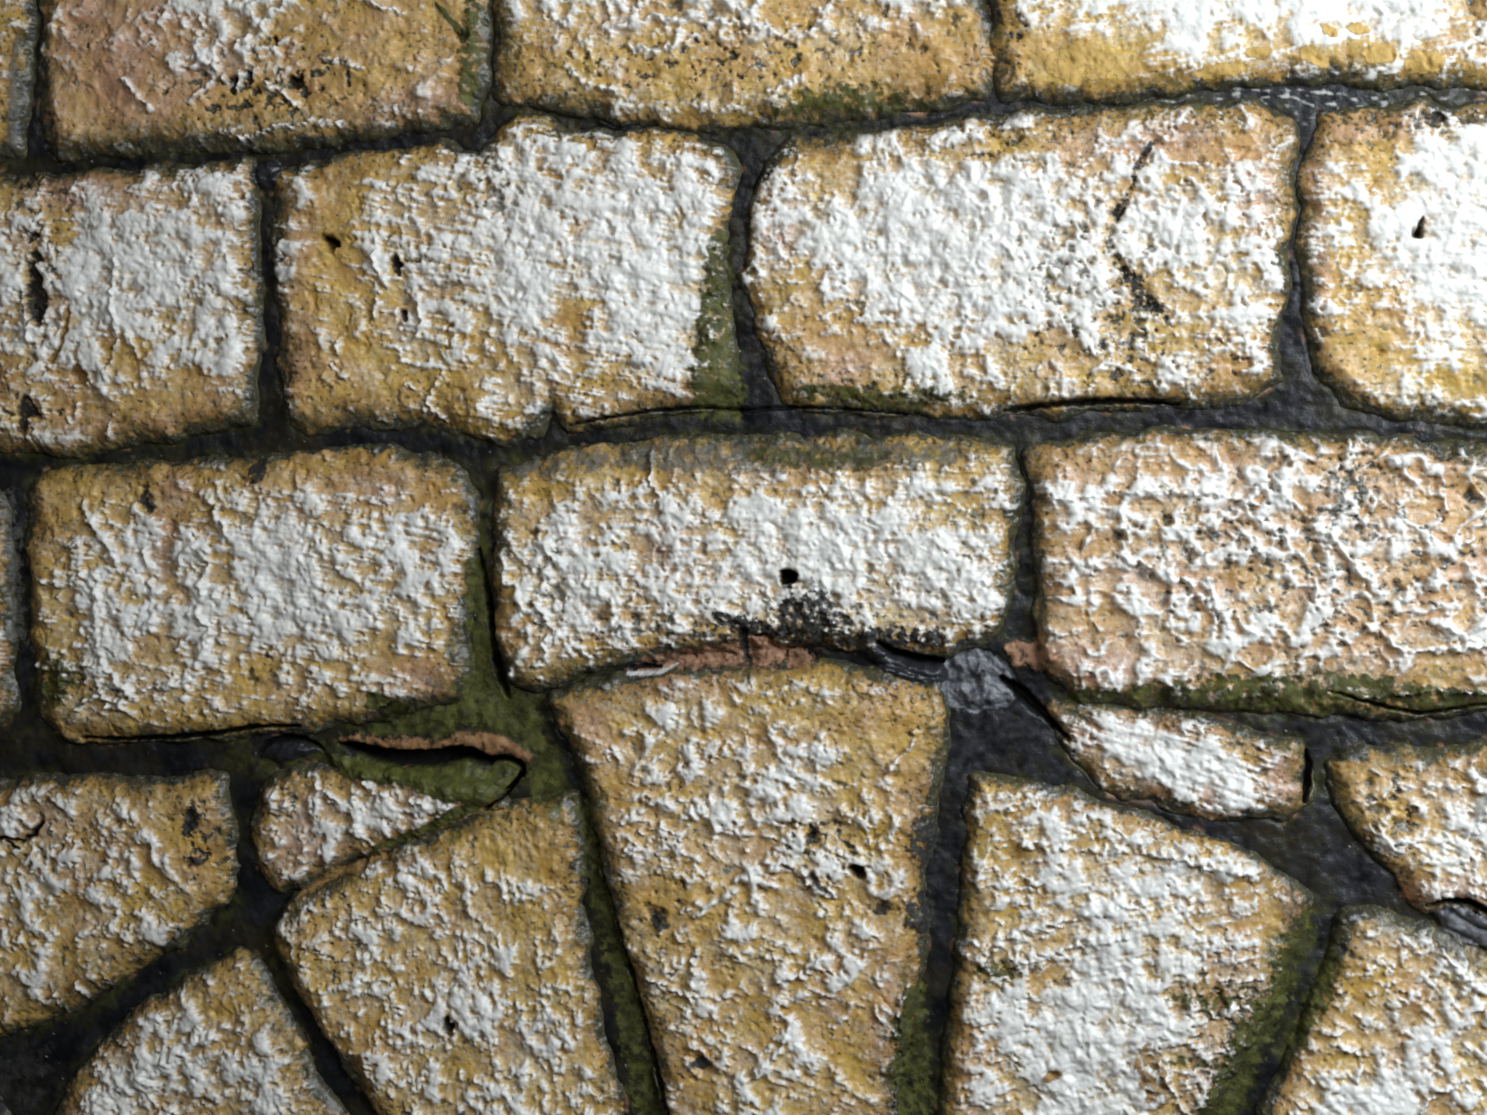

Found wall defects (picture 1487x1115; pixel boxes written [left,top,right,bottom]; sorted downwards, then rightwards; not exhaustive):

crack [569,406,698,426]
crack [744,406,904,415]
crack [1003,398,1175,412]
spalling [627,627,819,677]
water stain [365,691,391,710]
crack [85,724,532,809]
water stain [371,769,525,852]
crack [1426,898,1487,912]
water stain [973,961,1022,982]
water stain [1166,985,1255,1019]
water stain [1284,947,1341,1059]
water stain [1168,1055,1222,1071]